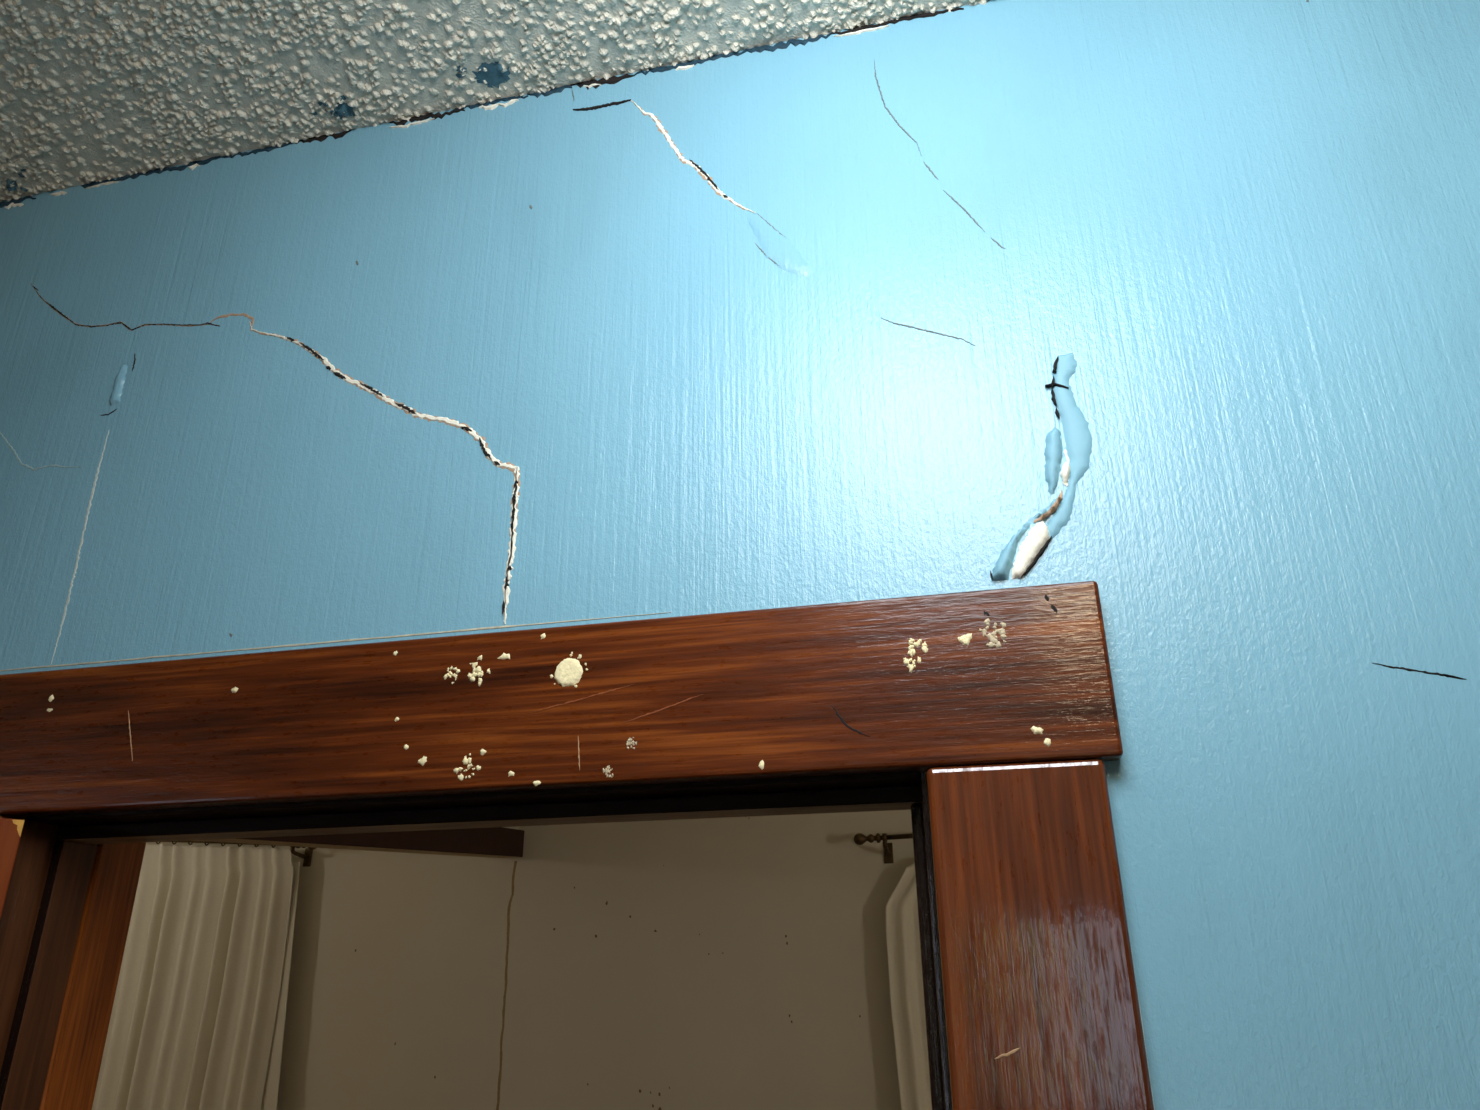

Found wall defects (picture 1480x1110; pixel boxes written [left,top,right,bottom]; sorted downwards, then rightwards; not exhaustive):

crack [0,130,351,209]
crack [389,8,1006,268]
crack [0,409,116,665]
crack [31,283,520,624]
peeling [990,352,1092,581]